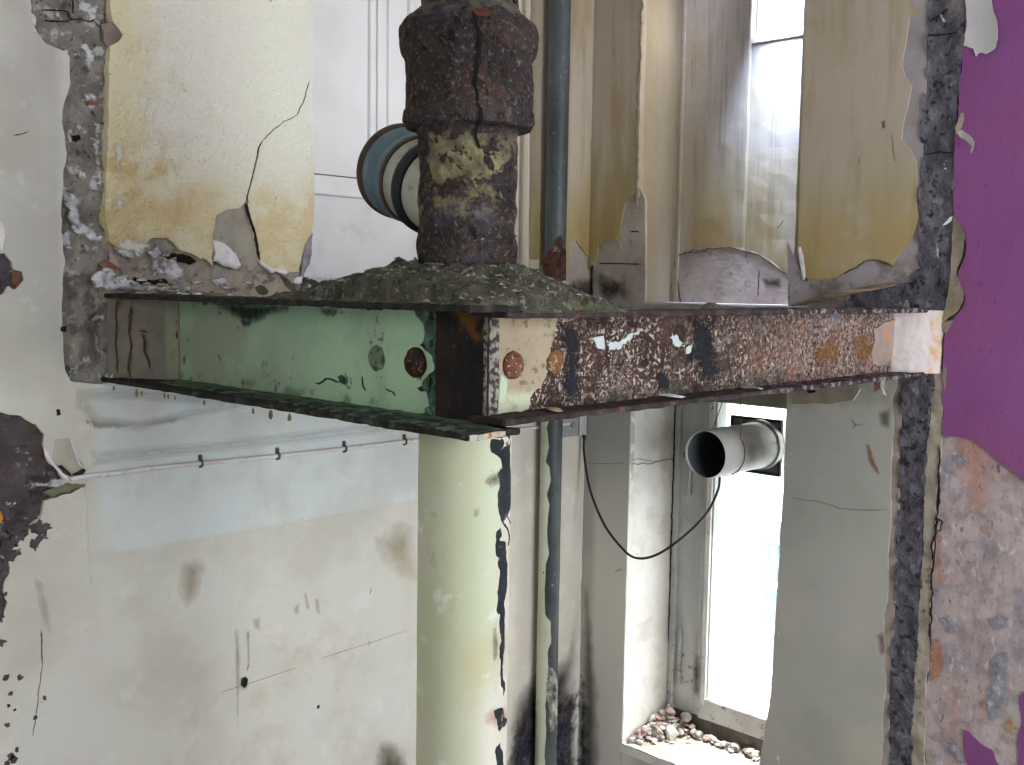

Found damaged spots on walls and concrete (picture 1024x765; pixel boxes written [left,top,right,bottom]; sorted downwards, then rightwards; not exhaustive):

flaking render [100,22,121,48]
water stain [119,238,148,253]
flaking render [91,203,313,303]
crack [245,81,310,260]
peeling [566,0,647,302]
peeling [671,0,929,307]
flaking render [0,412,86,622]
peeling [490,436,511,695]
peeling [925,436,1024,765]
peeling [494,708,507,765]